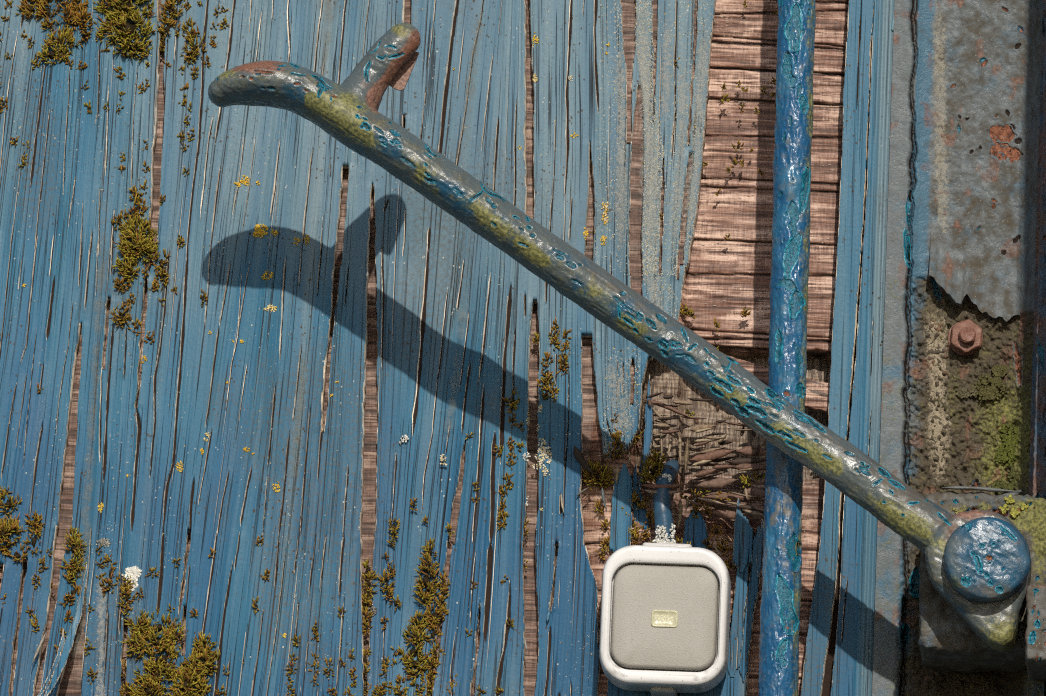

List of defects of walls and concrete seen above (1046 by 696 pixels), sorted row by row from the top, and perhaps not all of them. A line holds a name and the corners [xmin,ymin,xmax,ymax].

peeling [277,63,337,101]
peeling [355,106,442,184]
crack [402,0,701,296]
peeling [778,0,811,143]
rust [988,122,1022,165]
peeling [777,158,811,319]
crack [0,0,635,696]
peeling [614,291,826,453]
peeling [845,451,905,504]